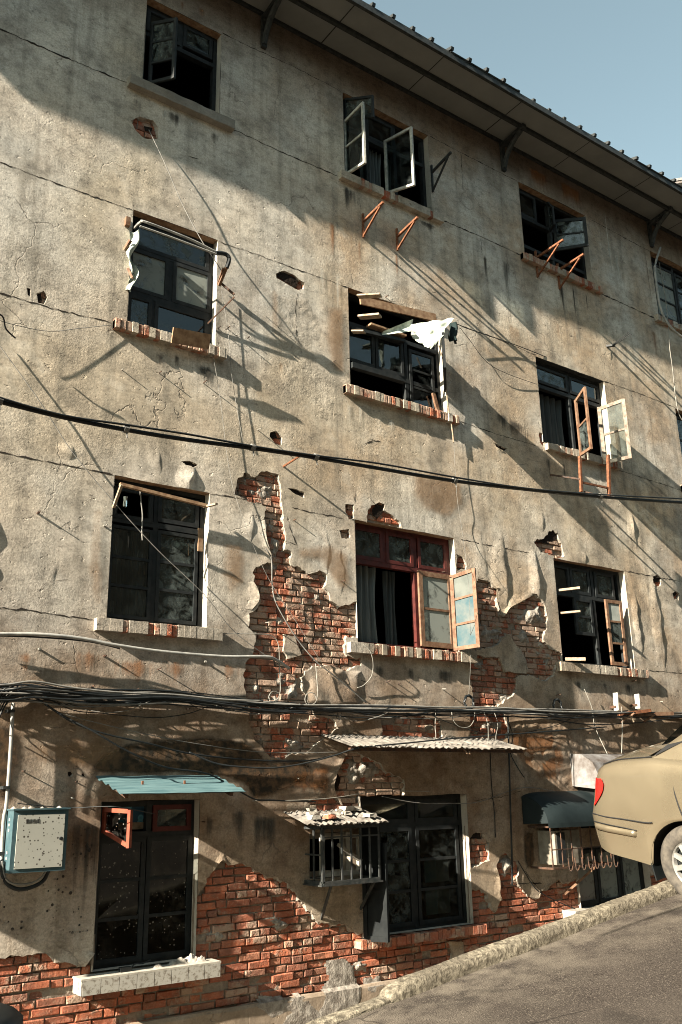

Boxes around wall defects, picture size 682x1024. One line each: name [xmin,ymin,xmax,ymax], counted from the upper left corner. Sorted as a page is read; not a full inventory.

crack [0,28,125,82]
crack [0,162,132,210]
flaking render [366,502,402,528]
flaking render [535,530,566,562]
flaking render [234,471,361,760]
flaking render [361,579,561,741]
flaking render [287,752,405,811]
flaking render [0,826,579,1024]